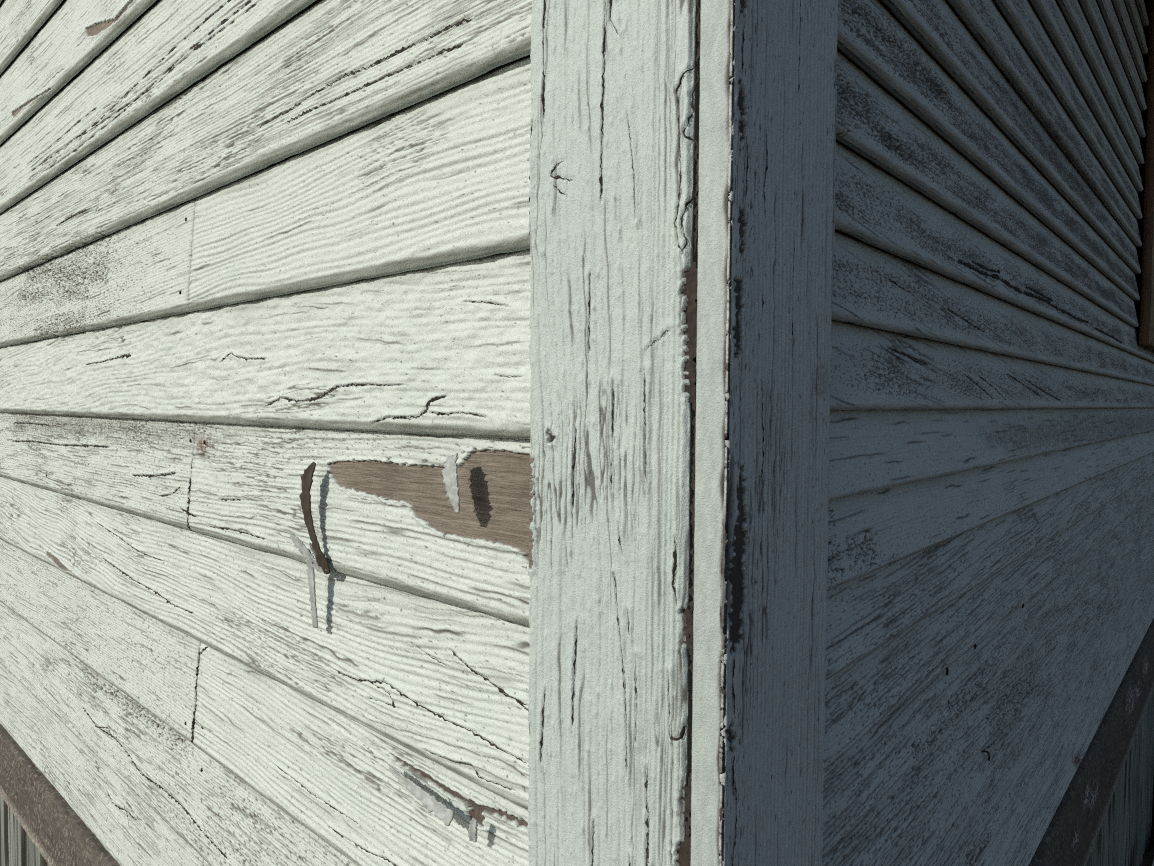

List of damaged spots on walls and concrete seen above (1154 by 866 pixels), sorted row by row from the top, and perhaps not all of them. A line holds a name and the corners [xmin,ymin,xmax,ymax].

peeling [87,0,133,36]
crack [599,0,635,213]
crack [674,68,699,253]
peeling [732,280,741,355]
crack [267,383,401,406]
crack [374,395,486,422]
crack [132,455,264,539]
peeling [330,450,535,568]
peeling [728,469,745,653]
crack [191,647,208,746]
crack [336,621,577,790]
crack [613,526,649,866]